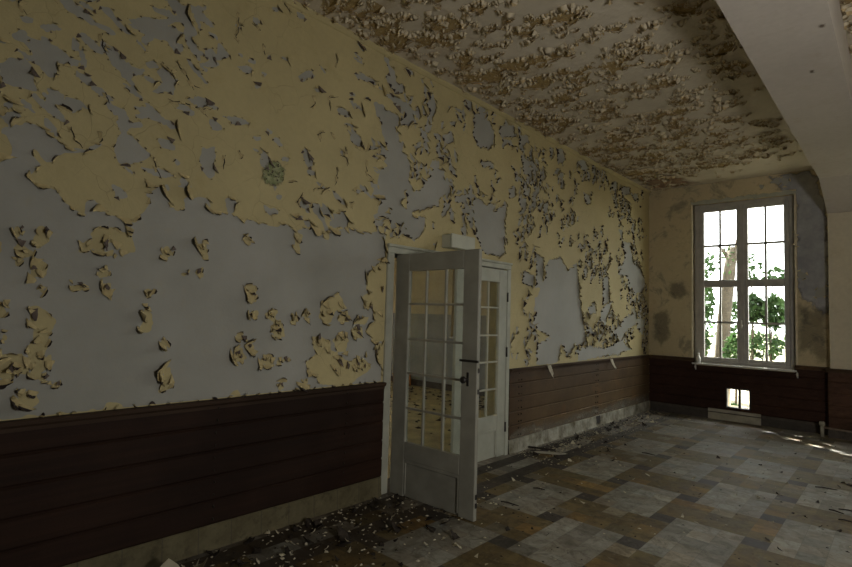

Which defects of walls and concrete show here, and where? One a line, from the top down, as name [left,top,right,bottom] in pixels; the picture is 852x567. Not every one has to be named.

mould [263,161,285,186]
peeling [0,0,803,420]